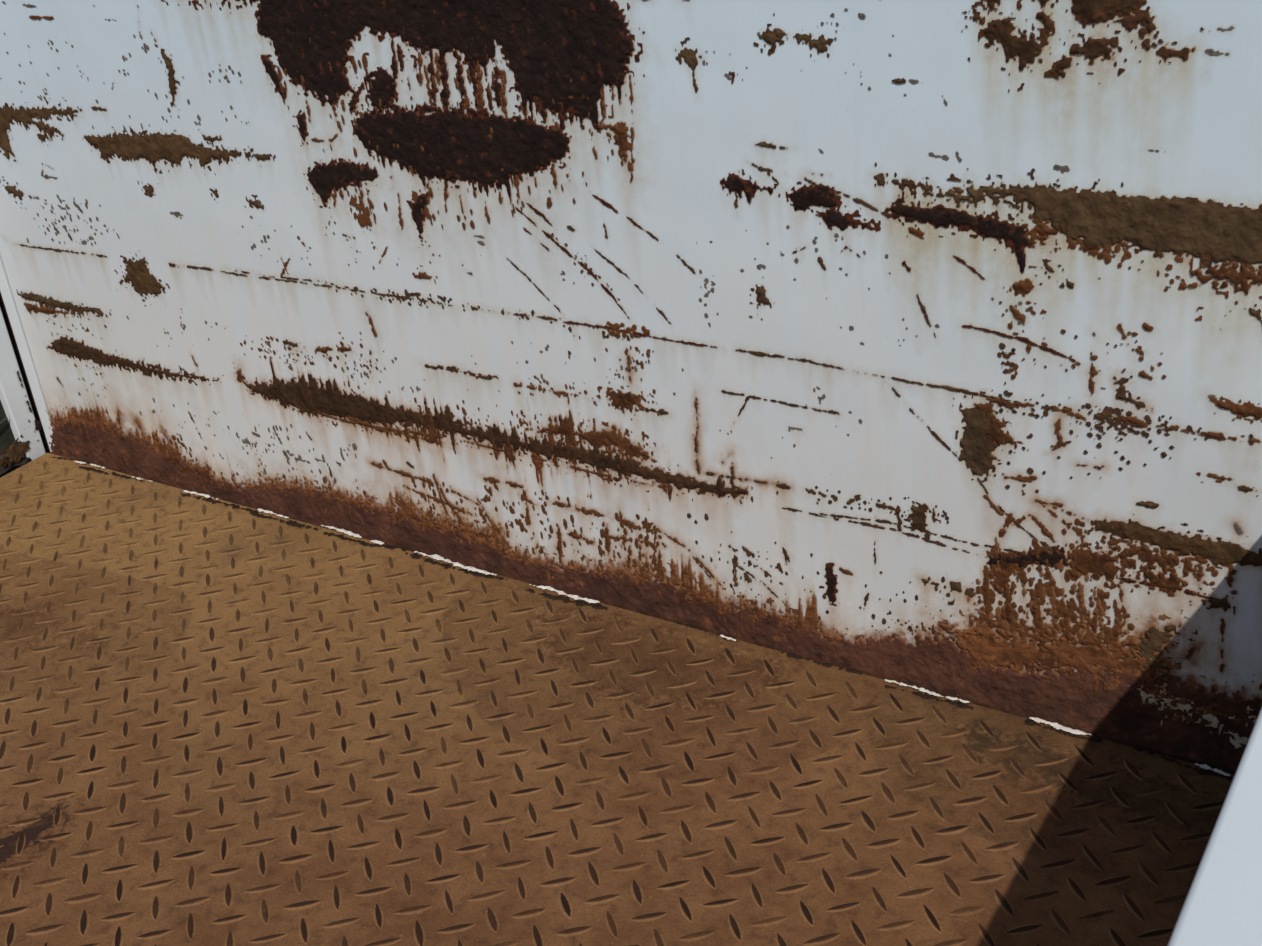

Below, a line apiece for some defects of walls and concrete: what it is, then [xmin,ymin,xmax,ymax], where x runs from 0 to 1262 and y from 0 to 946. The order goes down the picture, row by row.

corrosion [0,67,106,161]
corrosion [82,5,275,175]
corrosion [161,0,645,245]
corrosion [962,0,1196,92]
corrosion [0,161,1262,775]